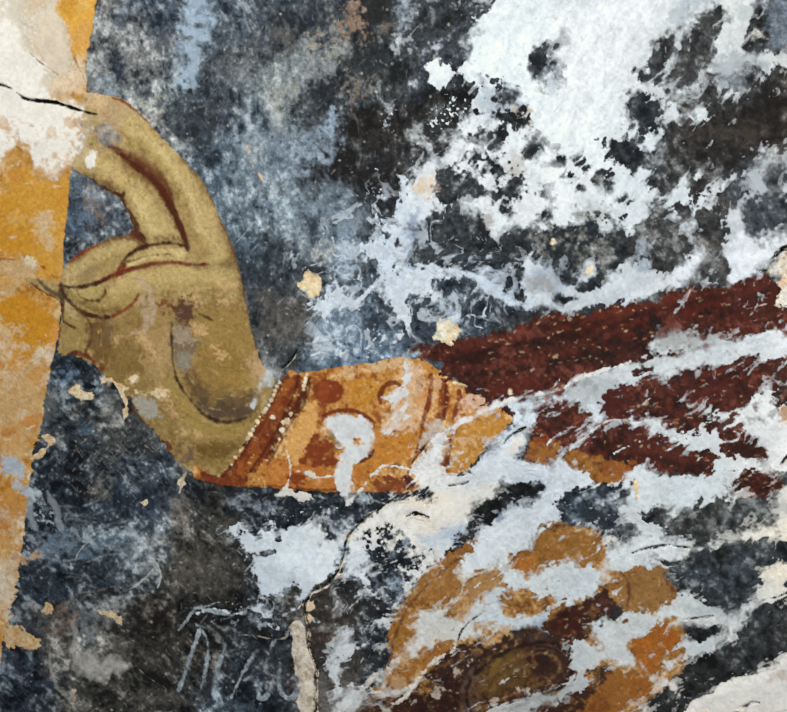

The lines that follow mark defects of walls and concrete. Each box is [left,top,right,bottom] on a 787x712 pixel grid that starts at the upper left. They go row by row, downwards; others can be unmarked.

peeling [32,3,76,79]
crack [0,84,97,115]
peeling [82,122,121,171]
peeling [194,0,787,712]
crack [303,481,469,712]
crack [736,701,761,712]